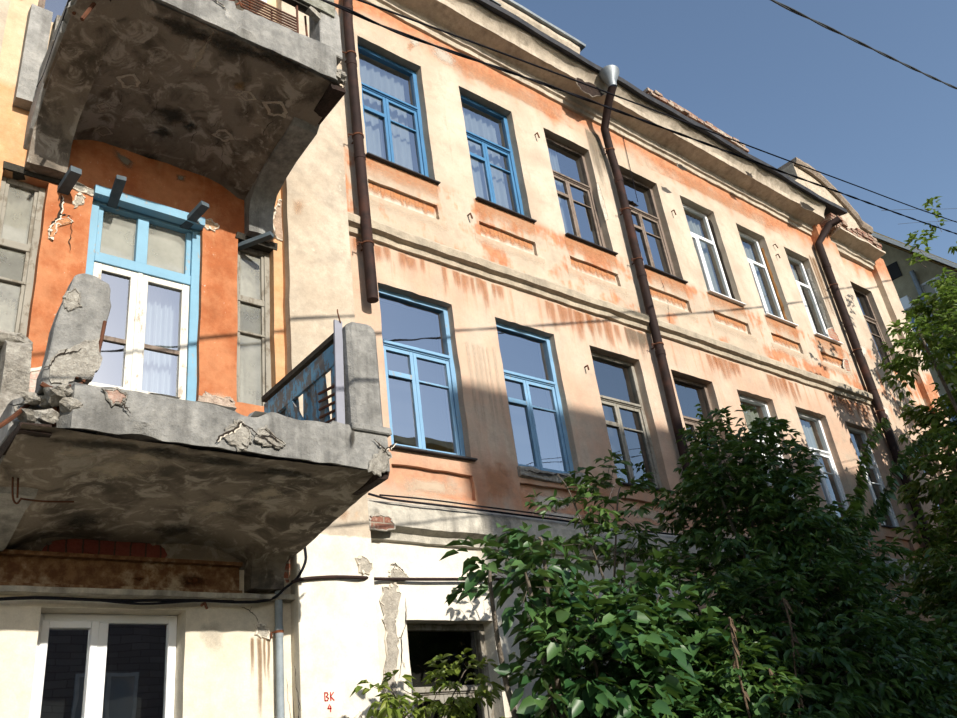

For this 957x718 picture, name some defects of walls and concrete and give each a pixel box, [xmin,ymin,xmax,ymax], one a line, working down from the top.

spalling [576,77,604,97]
spalling [48,182,103,240]
spalling [62,287,83,312]
spalling [99,320,107,352]
spalling [0,366,87,432]
spalling [198,391,286,452]
damp [55,439,252,479]
damp [252,469,306,500]
flaking render [369,513,396,532]
peeling [355,555,373,575]
peeling [342,567,407,718]
rust [251,638,270,697]